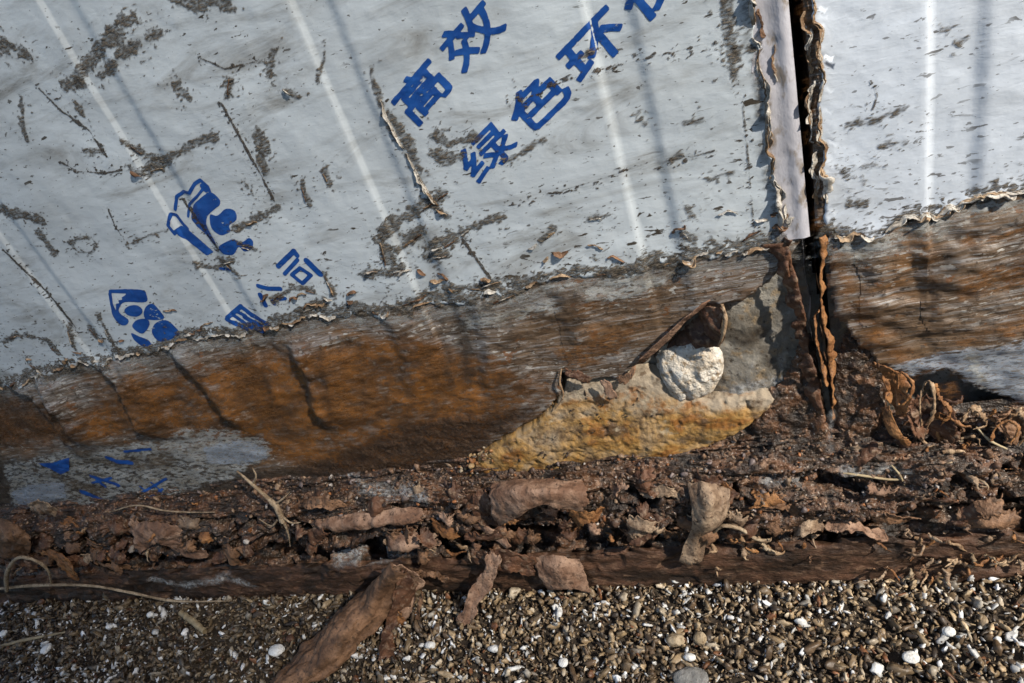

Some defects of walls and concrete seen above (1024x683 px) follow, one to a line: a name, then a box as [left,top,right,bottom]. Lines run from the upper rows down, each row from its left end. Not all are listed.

spalling [0,0,835,477]
peeling [821,165,1024,267]
corrosion [0,339,1024,683]